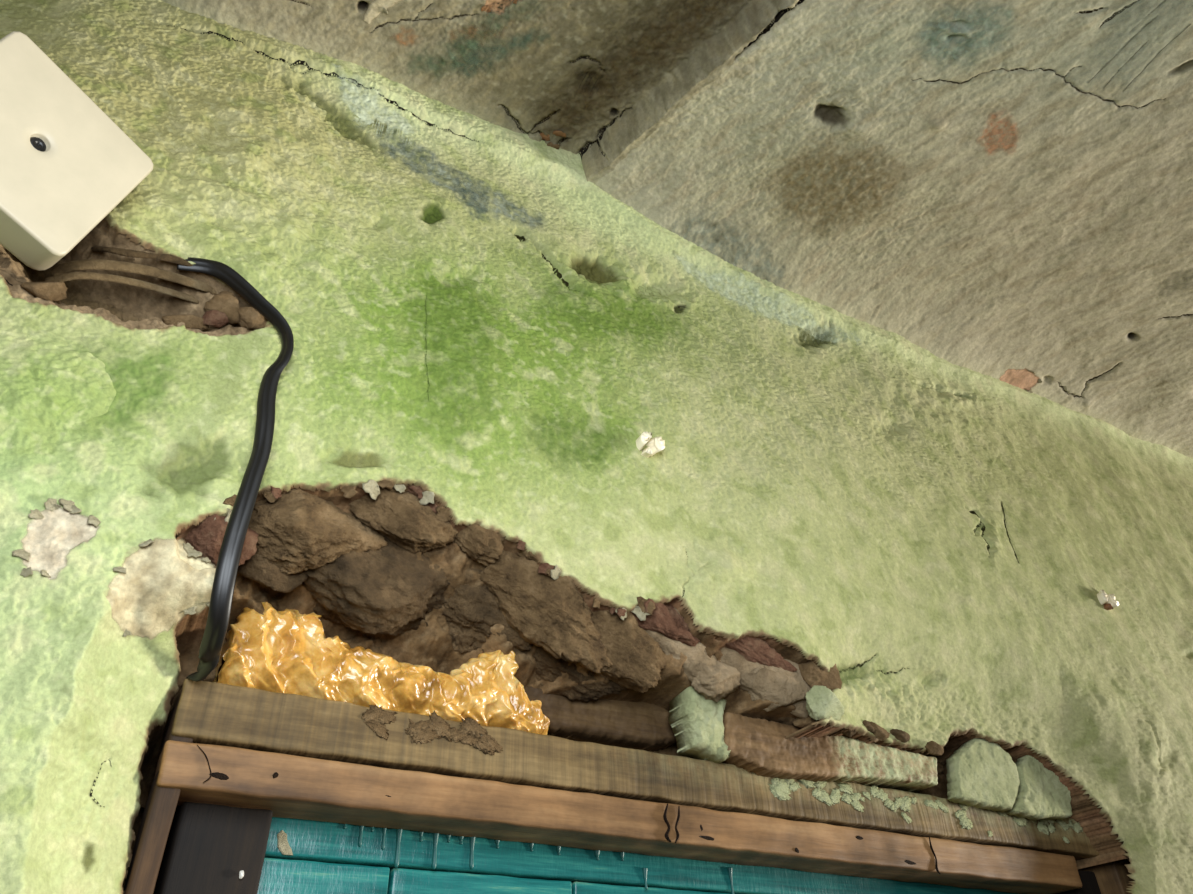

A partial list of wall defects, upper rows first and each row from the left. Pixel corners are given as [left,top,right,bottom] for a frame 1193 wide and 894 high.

crack [371,3,479,33]
crack [736,0,804,56]
crack [1079,0,1139,27]
crack [911,66,1164,109]
crack [502,105,625,161]
flaking render [0,219,268,336]
crack [1059,363,1119,398]
flaking render [12,498,101,579]
flaking render [106,479,1128,869]